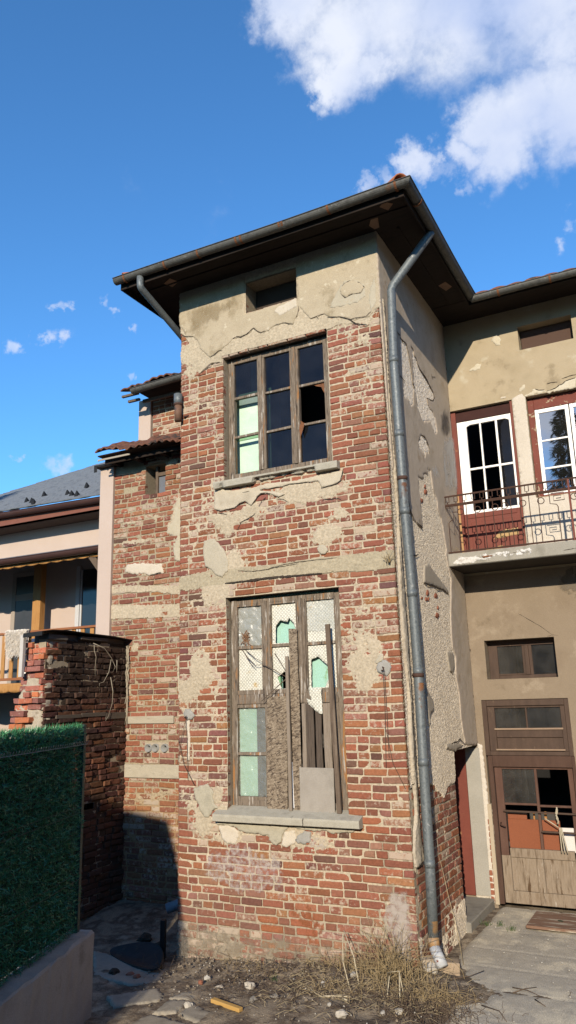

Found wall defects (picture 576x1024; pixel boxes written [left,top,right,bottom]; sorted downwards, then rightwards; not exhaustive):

crack [198,306,370,375]
spalling [400,339,436,456]
flaking render [214,471,343,511]
spalling [453,555,492,565]
flaking render [216,822,355,845]